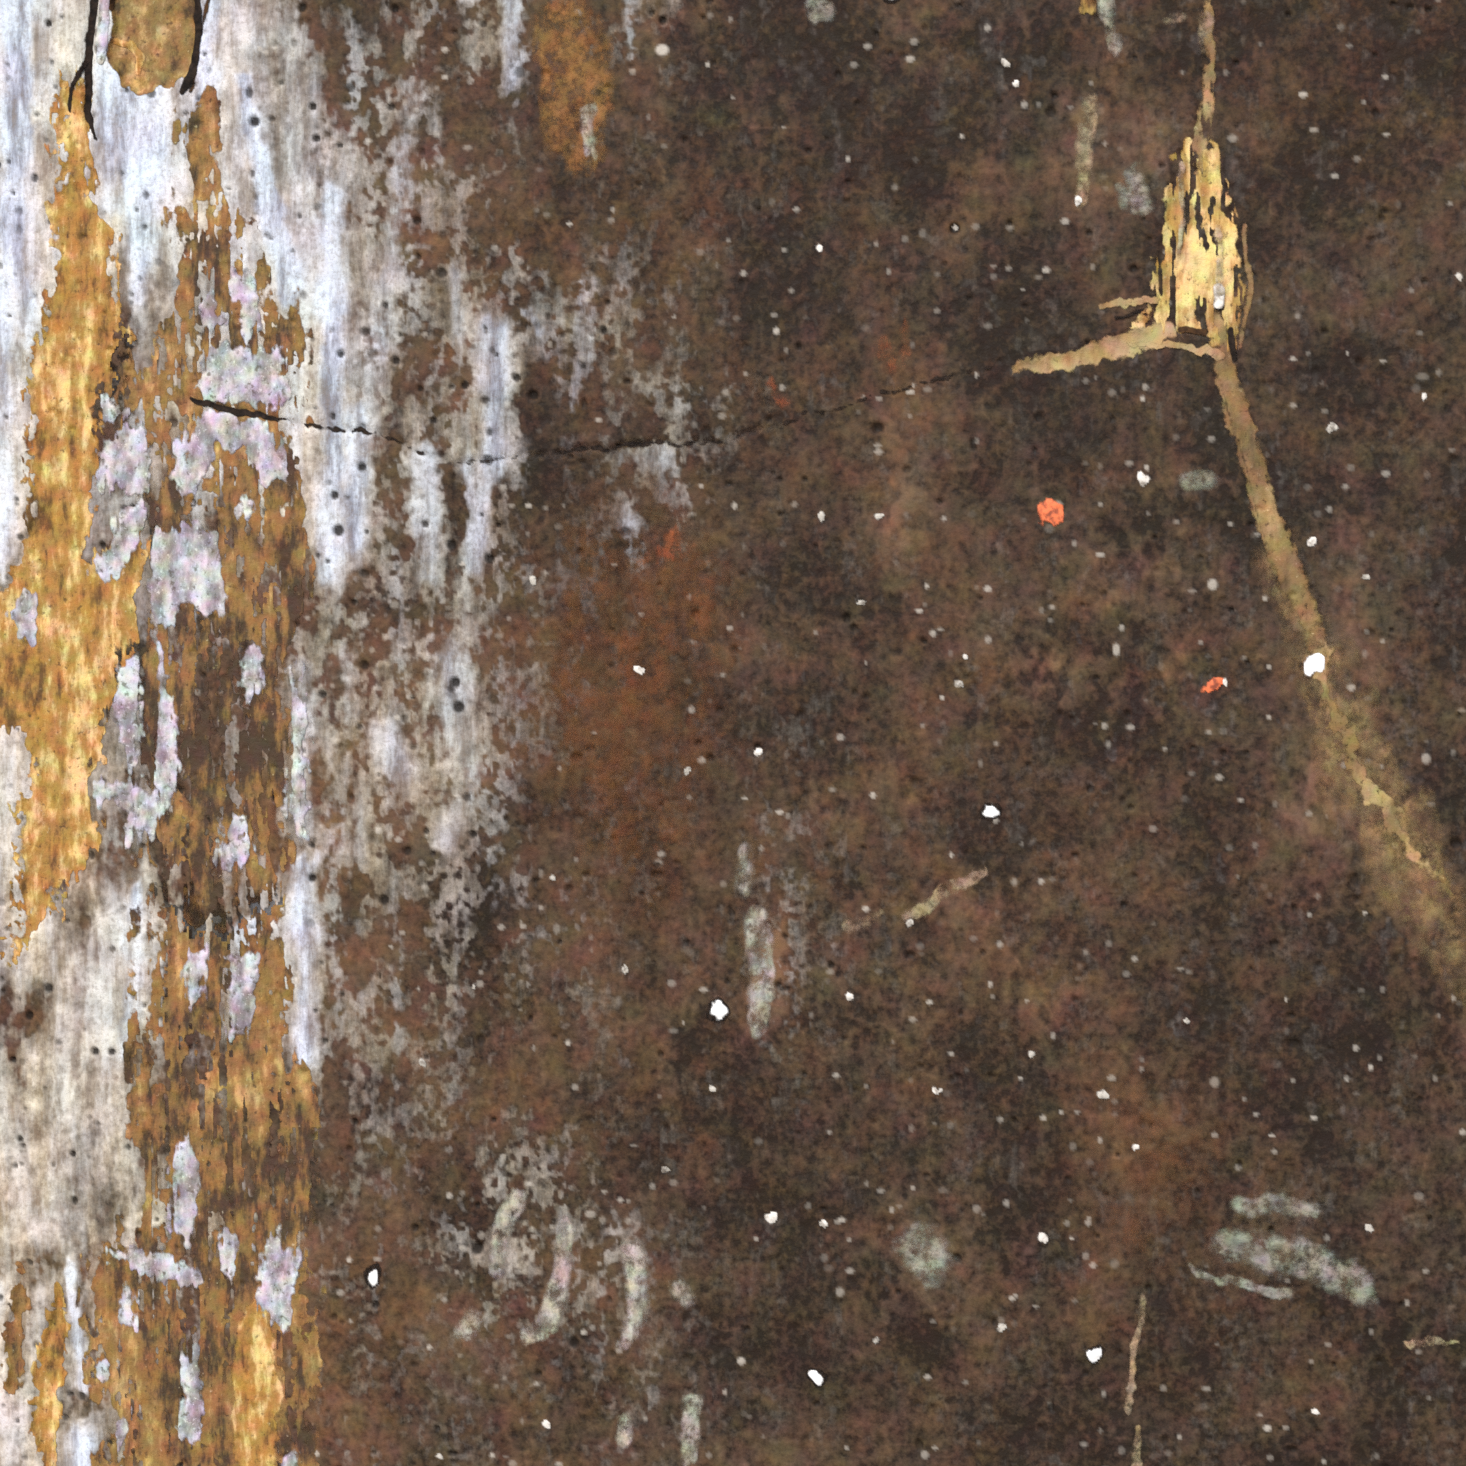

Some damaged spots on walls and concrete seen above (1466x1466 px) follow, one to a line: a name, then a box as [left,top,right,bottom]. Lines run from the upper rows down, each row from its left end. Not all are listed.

crack [67,0,98,140]
crack [202,0,210,27]
corrosion [534,0,611,169]
spalling [1079,0,1120,54]
crack [190,397,497,465]
crack [541,435,740,456]
crack [783,0,1465,960]
peeling [0,0,326,1466]